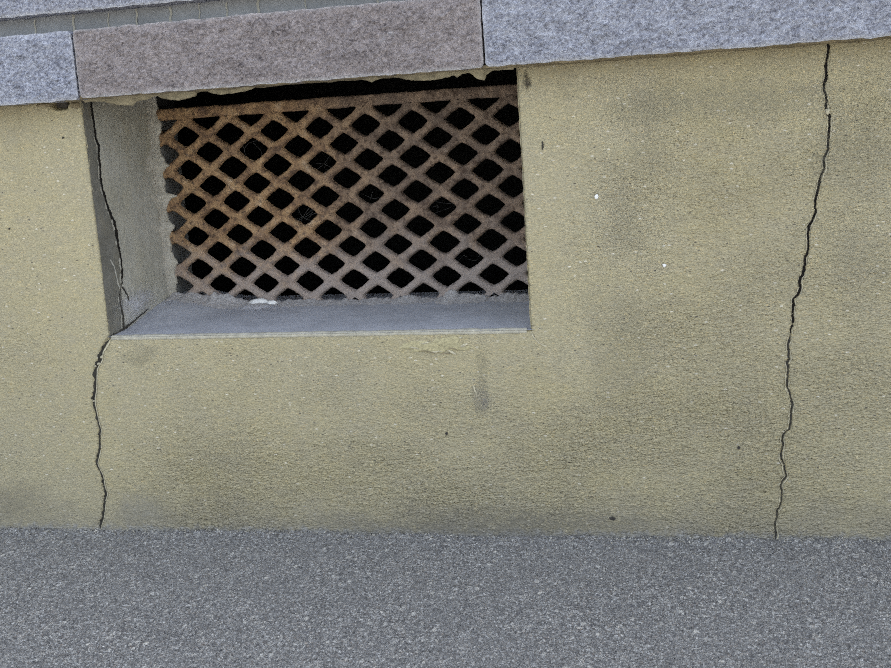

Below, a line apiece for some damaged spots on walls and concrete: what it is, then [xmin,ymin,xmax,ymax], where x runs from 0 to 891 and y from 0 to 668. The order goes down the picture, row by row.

crack [90,102,149,529]
crack [772,44,832,539]